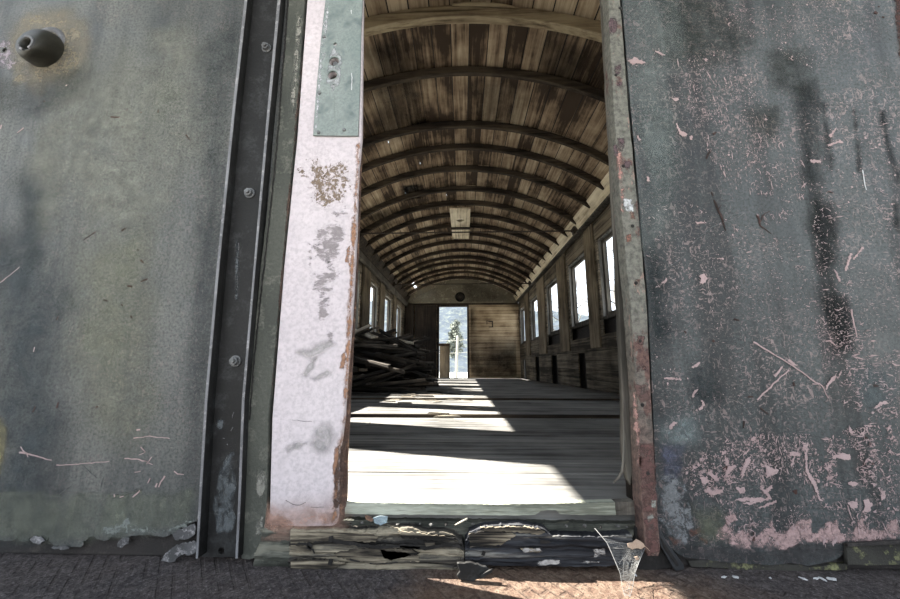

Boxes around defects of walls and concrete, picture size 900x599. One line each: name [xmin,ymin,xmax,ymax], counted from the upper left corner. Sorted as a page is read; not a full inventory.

leakage [804,142,815,186]
leakage [811,201,835,267]
rust [297,143,360,399]
peeling [672,50,900,550]
leakage [823,283,849,346]
rust [633,384,694,555]
peeling [30,536,70,550]
peeling [101,518,197,563]